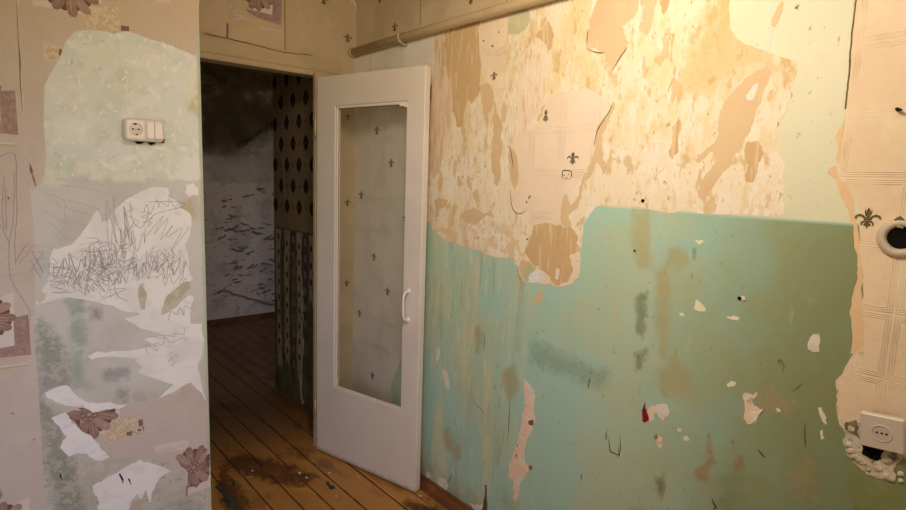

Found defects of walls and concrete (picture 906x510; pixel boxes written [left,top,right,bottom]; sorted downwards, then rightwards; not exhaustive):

peeling [428,36,452,180]
peeling [138,283,147,309]
peeling [162,281,191,315]
peeling [529,254,581,306]
peeling [807,334,821,352]
peeling [33,298,109,510]
peeling [82,402,128,413]
peeling [210,418,367,510]
peeling [508,379,535,501]
peeling [642,402,670,423]
peeling [743,392,763,425]
flaking render [835,347,904,483]